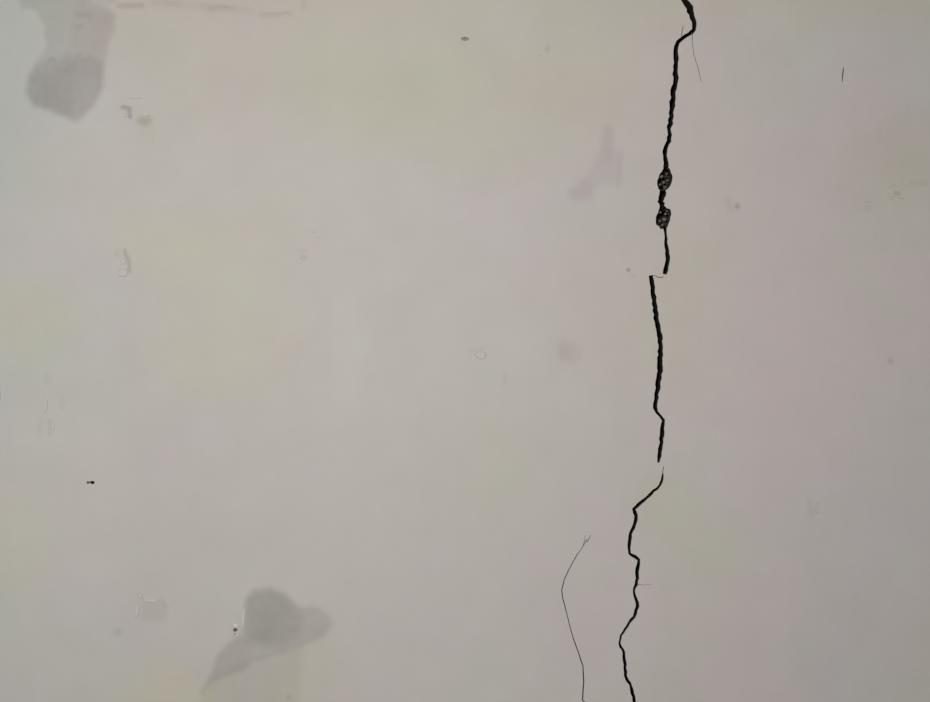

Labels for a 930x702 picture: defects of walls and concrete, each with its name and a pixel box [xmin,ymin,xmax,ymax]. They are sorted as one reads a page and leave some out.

water stain [16,0,308,125]
crack [615,0,701,702]
water stain [193,585,336,702]
crack [561,533,594,702]